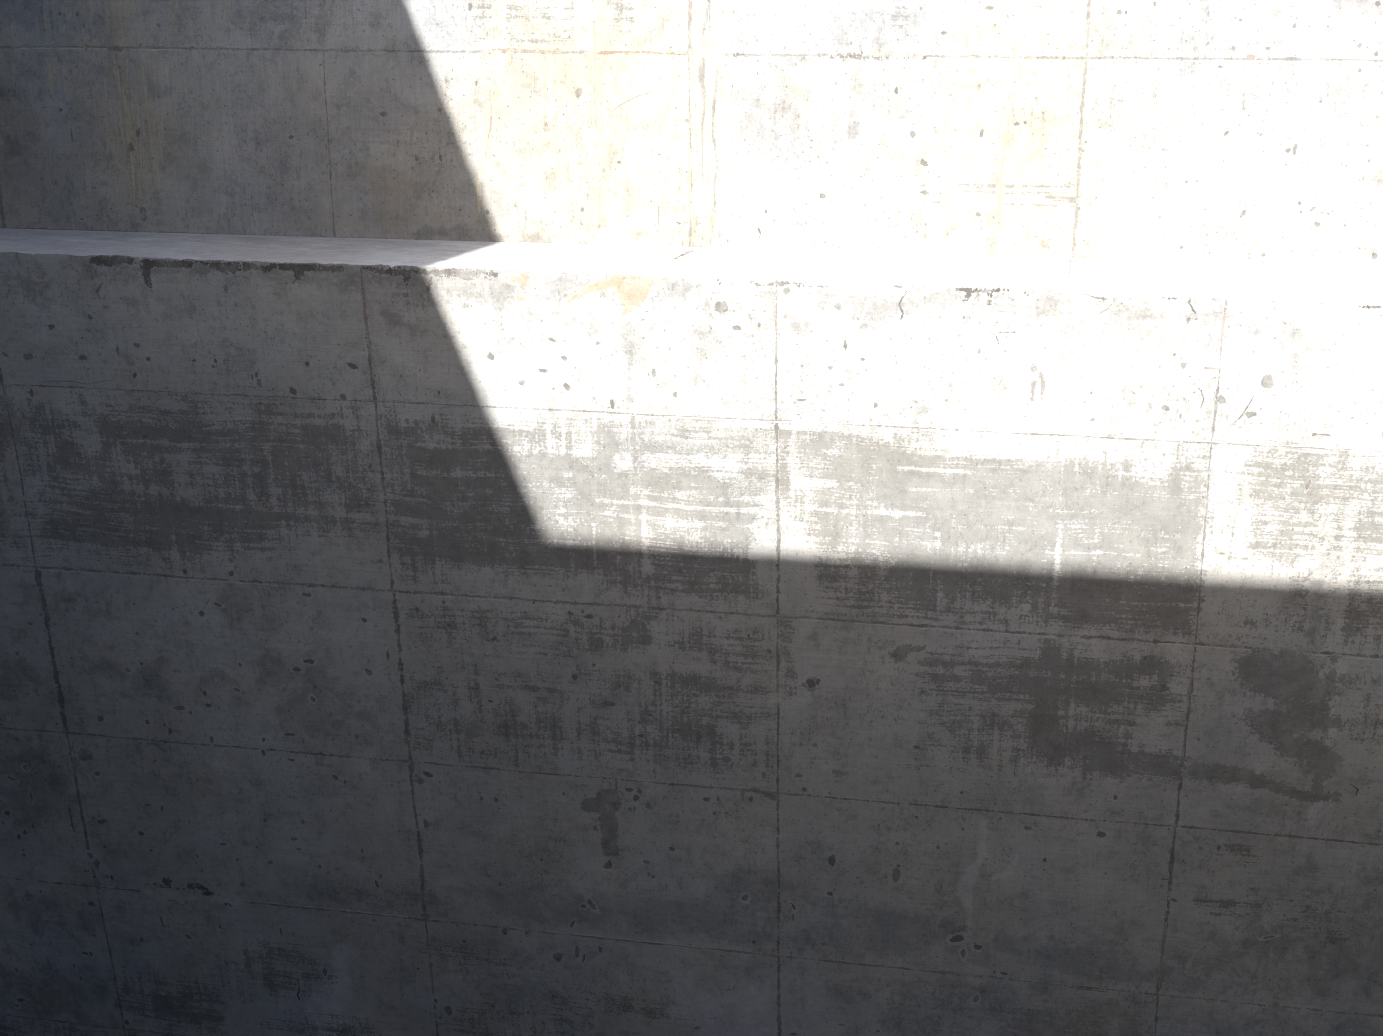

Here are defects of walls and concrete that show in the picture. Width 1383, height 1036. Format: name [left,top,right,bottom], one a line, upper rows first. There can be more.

rust [564,274,676,317]